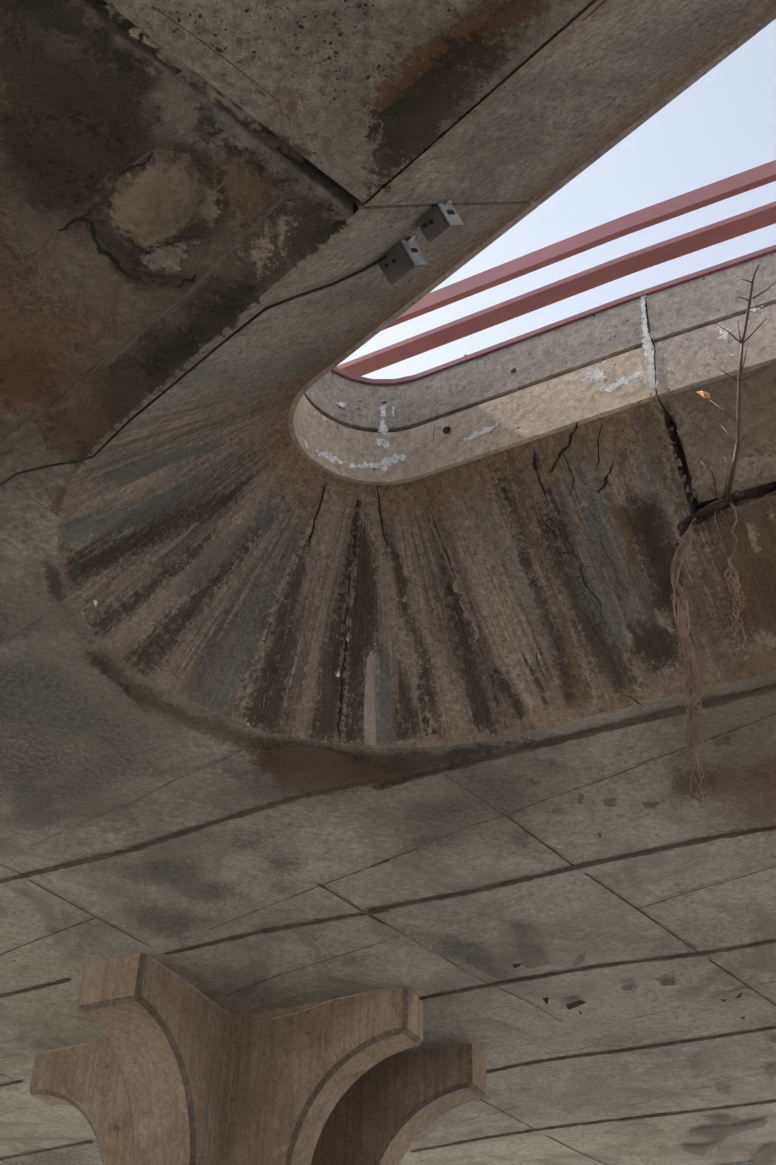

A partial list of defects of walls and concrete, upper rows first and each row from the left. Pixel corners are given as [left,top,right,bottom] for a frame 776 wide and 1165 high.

leakage [0,0,170,303]
leakage [360,0,553,197]
leakage [40,98,536,799]
crack [503,422,629,636]
leakage [598,370,648,392]
leakage [488,389,776,707]